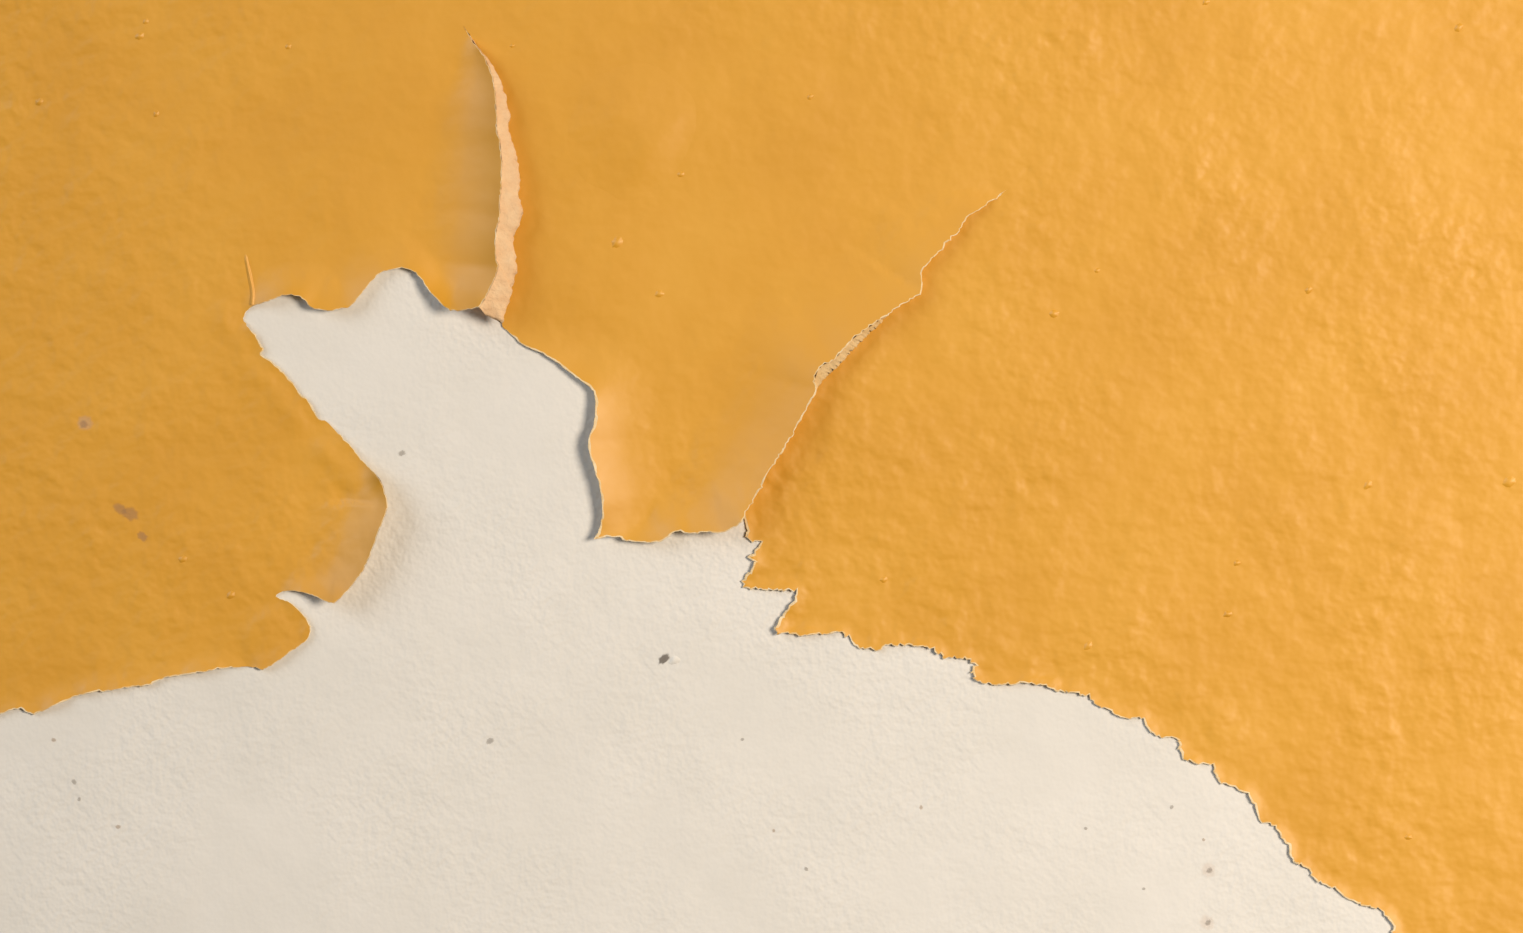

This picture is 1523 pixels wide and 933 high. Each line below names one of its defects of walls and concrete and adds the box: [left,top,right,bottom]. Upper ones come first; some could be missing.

peeling [239,26,523,323]
peeling [0,169,1394,933]